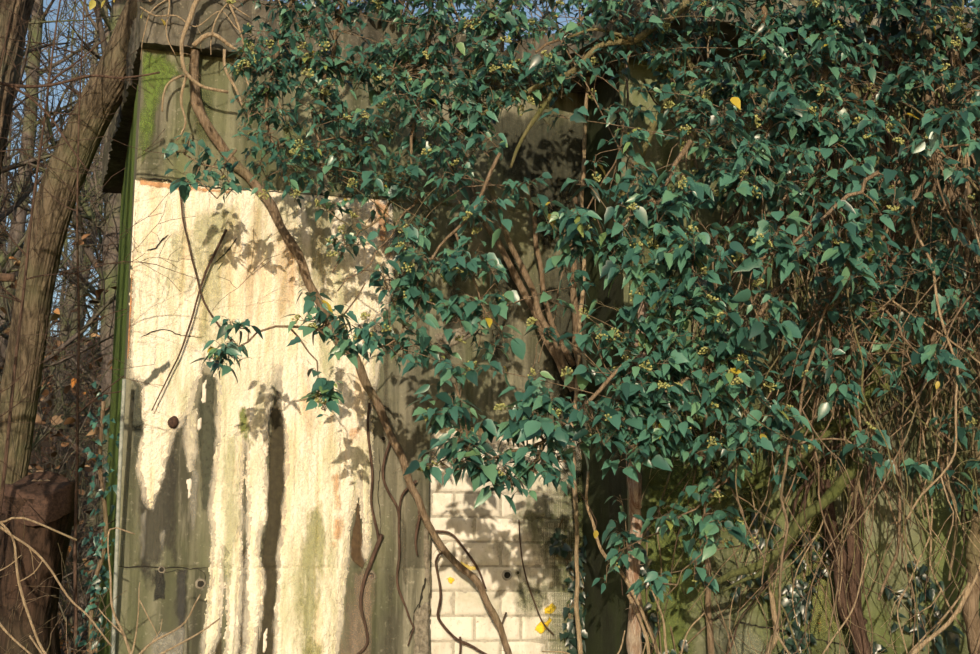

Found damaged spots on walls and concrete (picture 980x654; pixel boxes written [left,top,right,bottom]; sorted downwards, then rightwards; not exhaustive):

leakage [129,121,395,654]